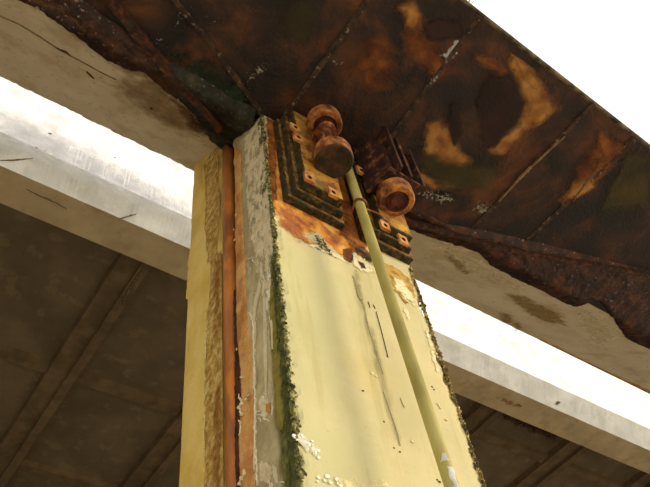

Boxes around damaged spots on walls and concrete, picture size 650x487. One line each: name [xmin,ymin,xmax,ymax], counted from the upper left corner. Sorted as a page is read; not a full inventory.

crack [0,15,116,80]
rust [400,3,463,76]
leakage [126,71,207,135]
crack [27,189,67,210]
rust [266,117,373,263]
rust [418,173,453,204]
rust [204,144,237,487]
spalling [303,232,376,273]
leakage [432,239,564,325]
spalling [385,264,486,487]